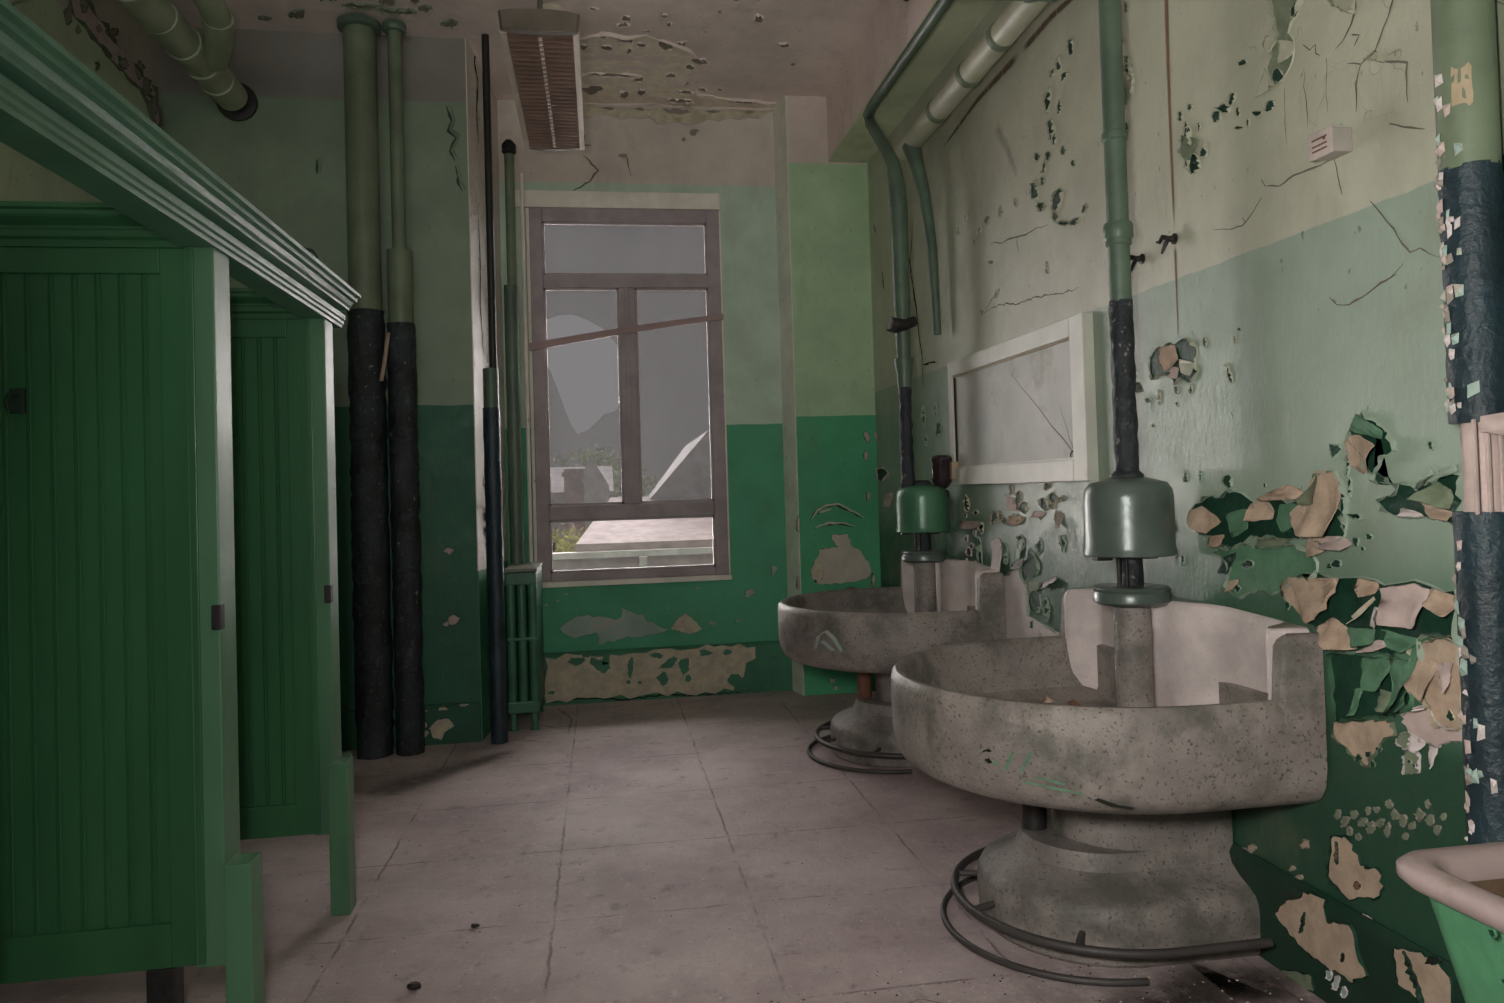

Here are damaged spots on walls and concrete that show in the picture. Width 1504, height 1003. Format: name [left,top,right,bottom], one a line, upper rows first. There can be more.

peeling [63,0,163,128]
peeling [579,6,778,141]
peeling [956,39,1089,245]
peeling [1177,0,1304,175]
crack [1213,0,1438,306]
peeling [1451,62,1473,107]
peeling [1135,337,1208,407]
peeling [544,607,756,703]
peeling [796,533,876,589]
peeling [1175,410,1464,775]
peeling [1274,799,1447,998]
peeling [1391,947,1455,1003]